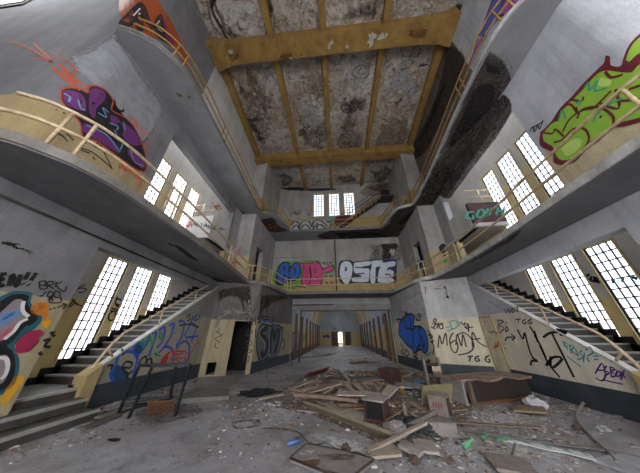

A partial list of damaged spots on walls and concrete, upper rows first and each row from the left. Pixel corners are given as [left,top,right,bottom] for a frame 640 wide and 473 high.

peeling [367,32,388,49]
damp [413,47,465,158]
damp [429,52,511,205]
damp [279,174,336,191]
crack [1,241,35,254]